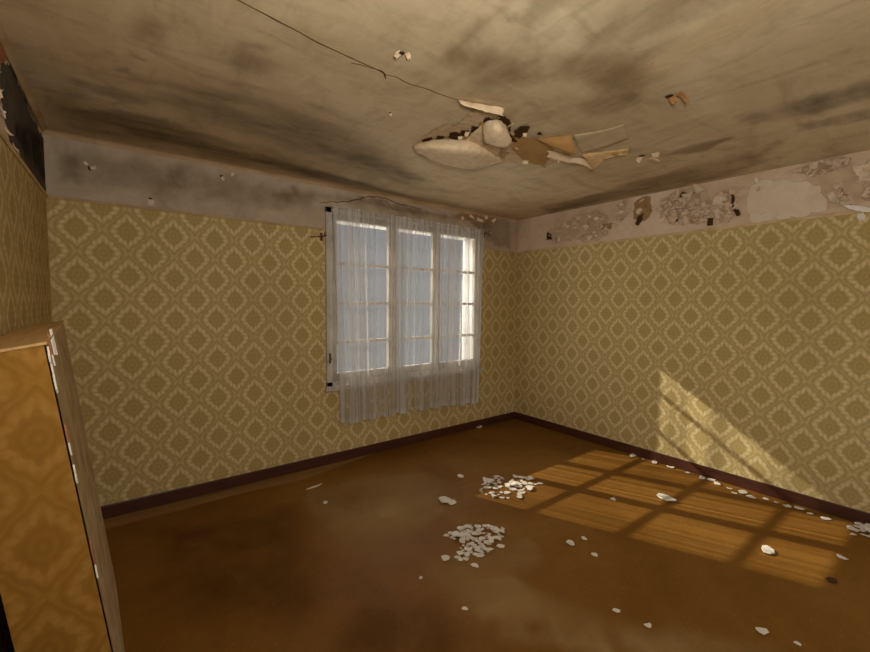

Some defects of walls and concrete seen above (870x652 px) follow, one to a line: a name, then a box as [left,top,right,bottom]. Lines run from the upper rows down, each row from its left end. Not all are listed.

crack [238,0,457,100]
spalling [0,41,46,192]
peeling [413,100,660,171]
spalling [547,156,870,244]